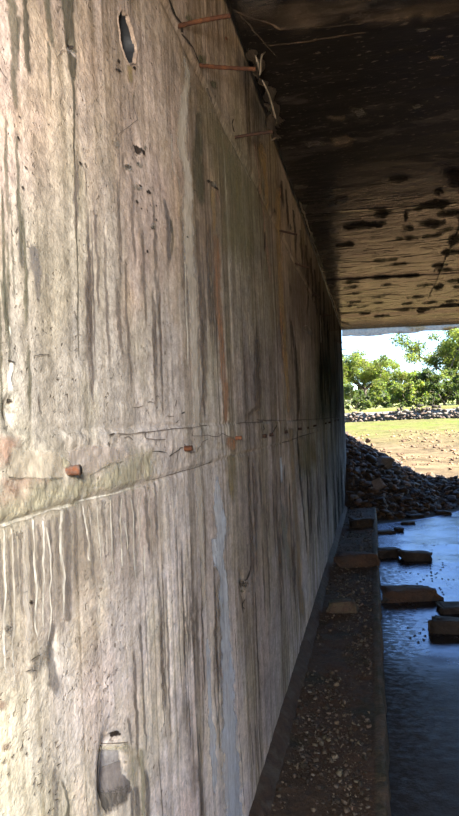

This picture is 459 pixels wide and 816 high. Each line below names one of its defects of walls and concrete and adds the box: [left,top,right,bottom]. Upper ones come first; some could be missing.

leakage [7,0,30,101]
crack [169,0,203,64]
crack [224,64,251,180]
leakage [61,0,132,398]
crack [338,228,459,315]
leakage [373,170,459,313]
crack [109,243,336,481]
crack [9,477,63,489]
leakage [159,65,245,816]
leakage [0,483,158,681]
spalling [97,730,133,814]
leakage [127,655,150,816]